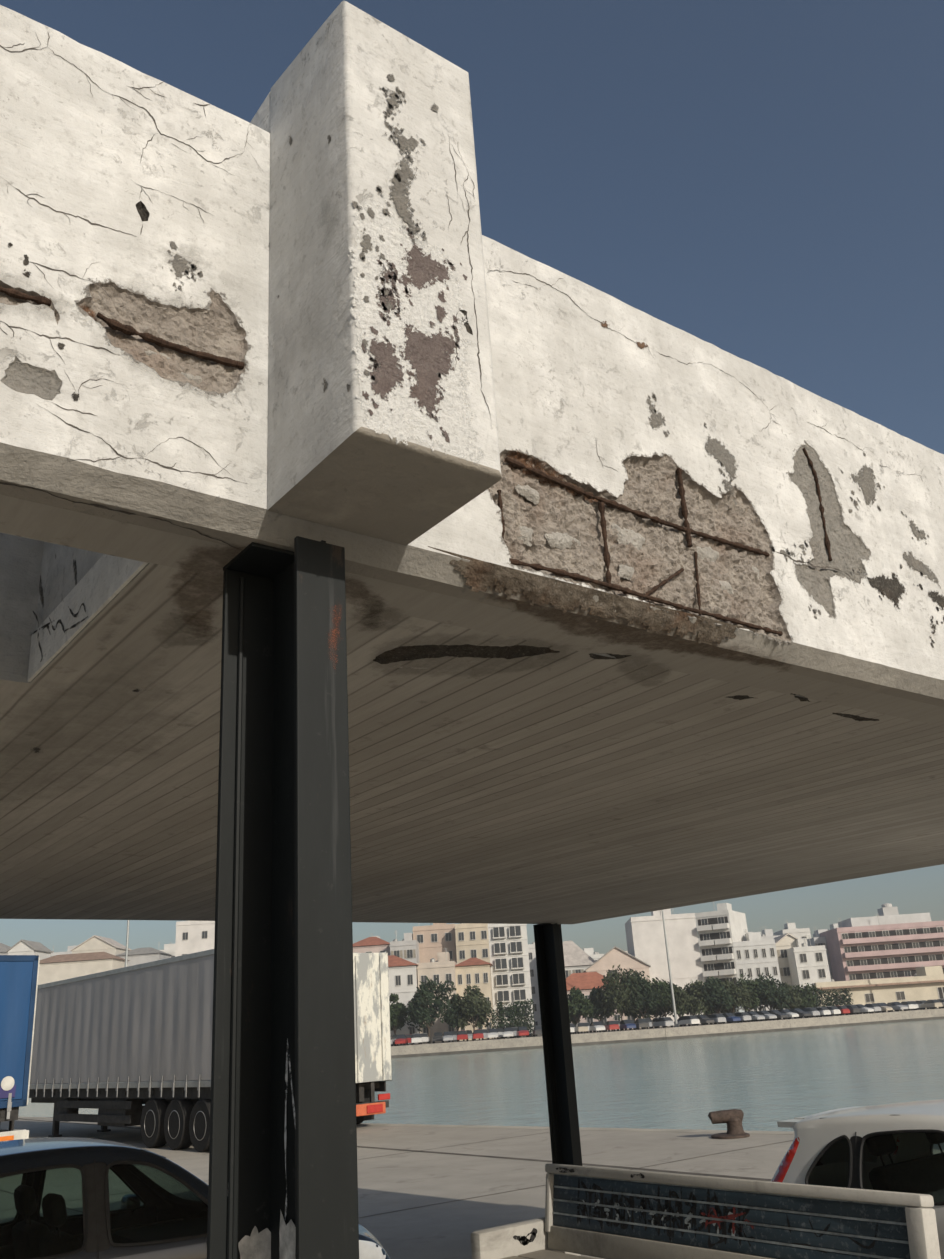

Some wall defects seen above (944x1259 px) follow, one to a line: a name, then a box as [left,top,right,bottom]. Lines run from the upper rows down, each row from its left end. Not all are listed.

crack [0,32,259,237]
spalling [0,255,60,324]
spalling [0,356,79,400]
crack [0,321,247,484]
spalling [74,241,253,398]
spalling [346,73,944,648]
crack [444,143,920,476]
spalling [373,644,559,669]